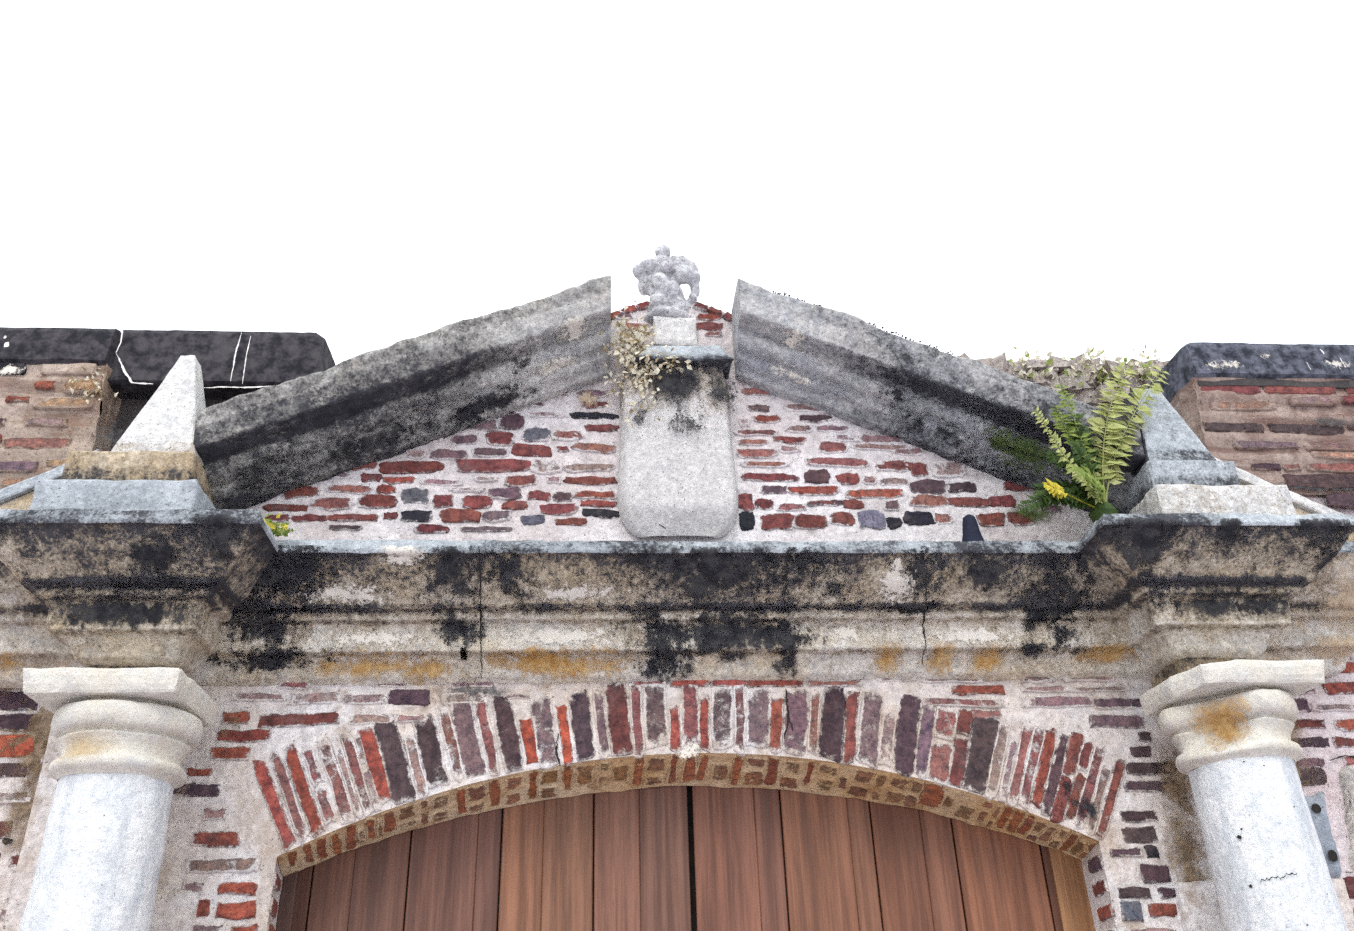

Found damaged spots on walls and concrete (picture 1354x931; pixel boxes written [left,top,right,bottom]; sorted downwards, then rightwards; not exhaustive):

water stain [226,352,555,488]
water stain [875,368,988,450]
water stain [49,514,251,638]
water stain [206,545,864,683]
water stain [878,545,1099,659]
water stain [1110,518,1290,620]
water stain [1263,518,1354,665]